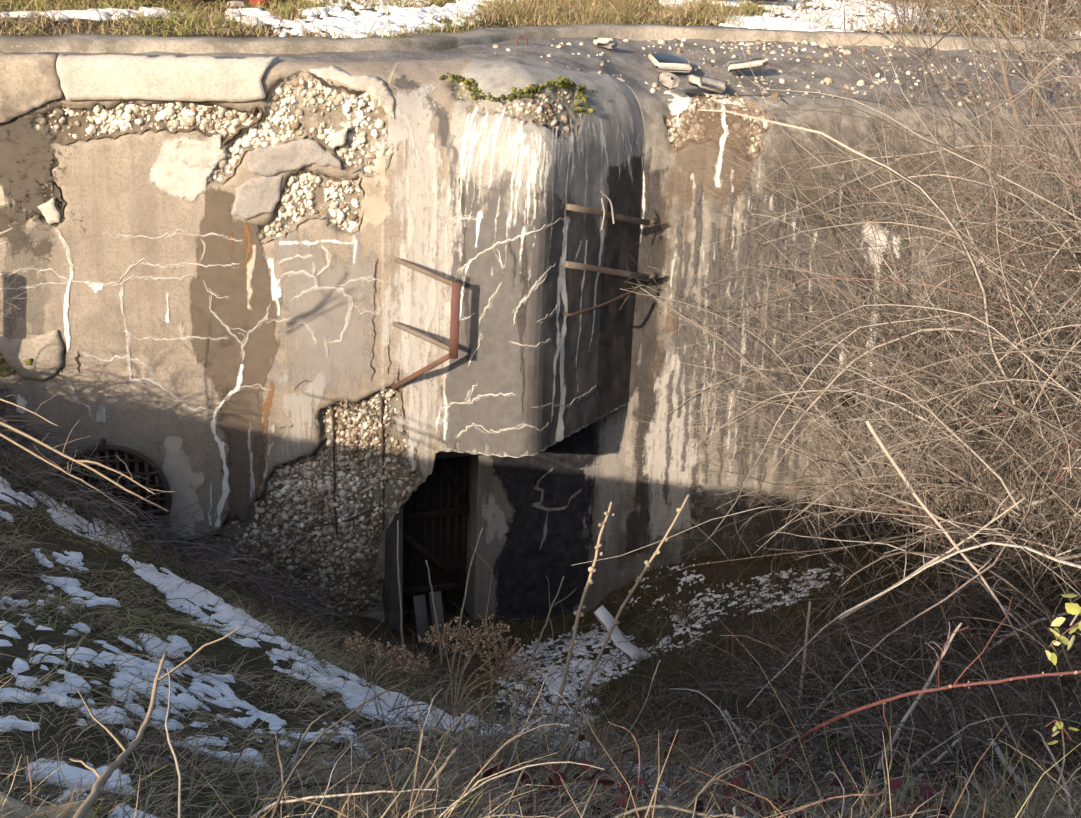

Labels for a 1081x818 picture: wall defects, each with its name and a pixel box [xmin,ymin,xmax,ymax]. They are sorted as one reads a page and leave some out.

spalling [0,143,66,227]
spalling [29,65,398,243]
spalling [447,80,582,139]
spalling [665,95,770,159]
spalling [0,352,15,376]
crack [0,229,402,418]
crack [441,217,596,439]
leakage [161,75,911,556]
spalling [182,387,424,617]